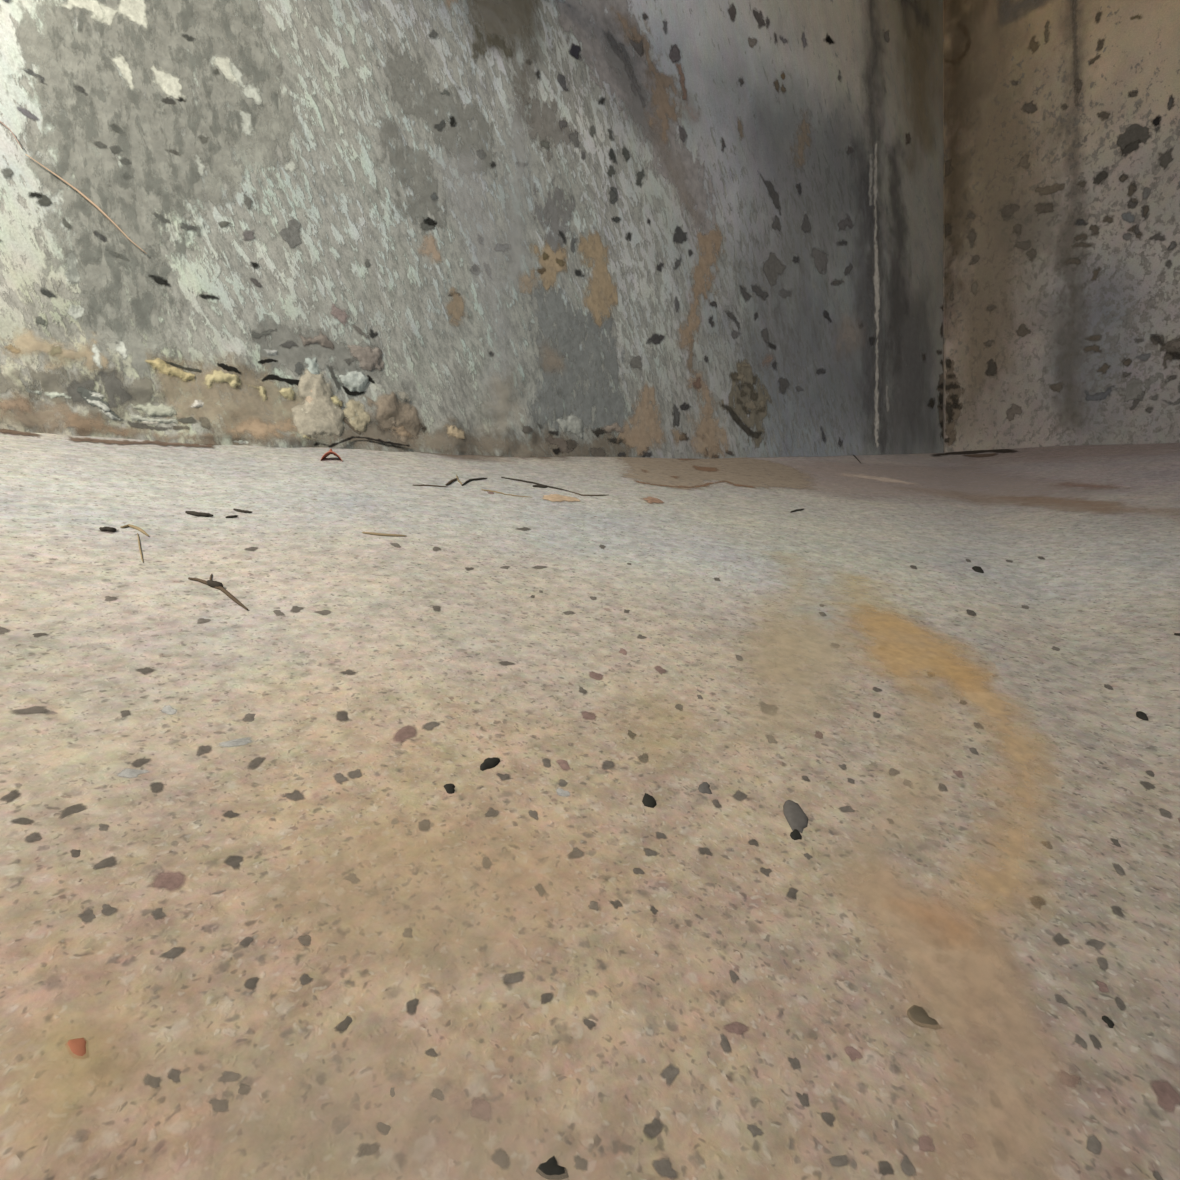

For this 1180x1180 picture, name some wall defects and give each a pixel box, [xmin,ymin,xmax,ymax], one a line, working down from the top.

spalling [569,44,581,59]
peeling [748,10,787,47]
peeling [16,0,311,388]
peeling [372,38,496,232]
peeling [514,74,630,223]
spalling [657,226,693,271]
water stain [859,0,926,446]
water stain [944,0,1023,383]
peeling [36,387,210,430]
flaking render [251,303,384,400]
peeling [523,283,651,457]
spalling [647,334,664,344]